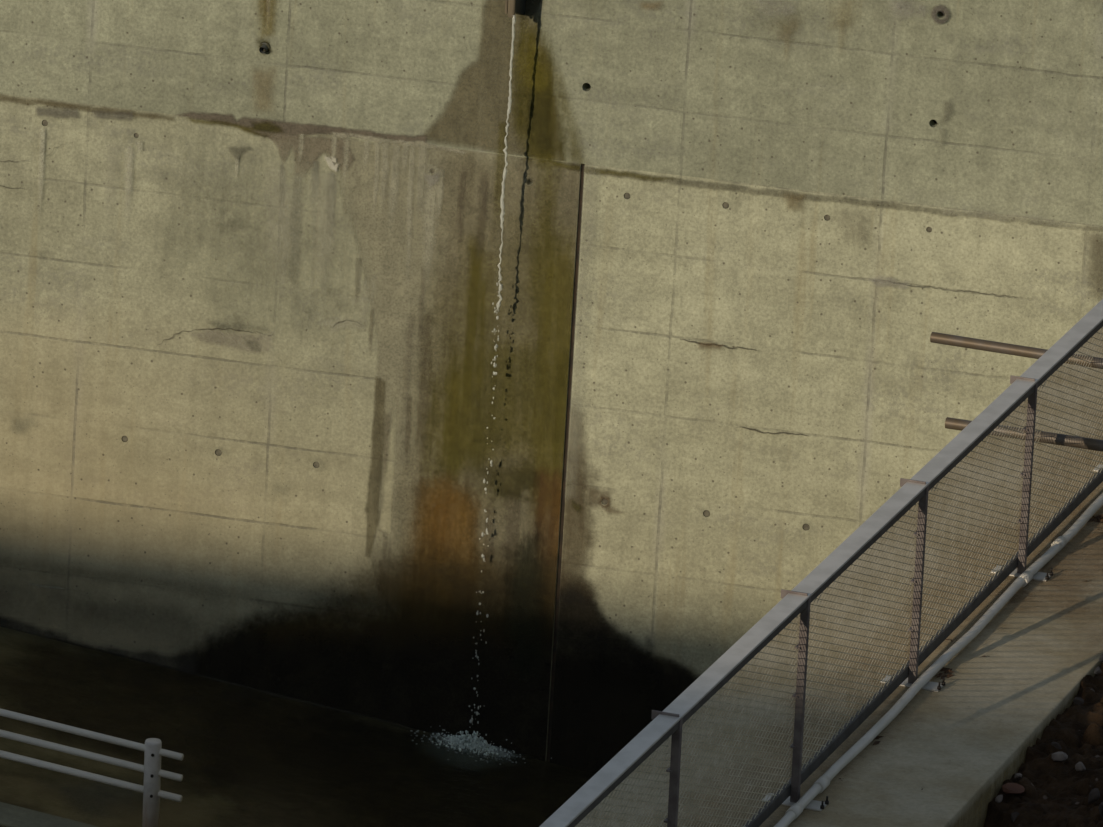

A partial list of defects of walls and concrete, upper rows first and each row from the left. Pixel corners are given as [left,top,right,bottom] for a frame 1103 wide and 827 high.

leakage [0,0,698,827]